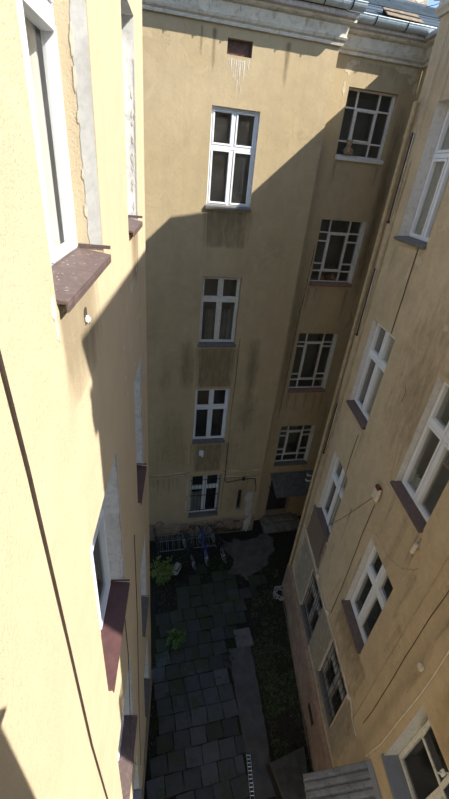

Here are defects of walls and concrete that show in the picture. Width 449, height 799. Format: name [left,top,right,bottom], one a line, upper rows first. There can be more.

peeling [69,0,102,249]